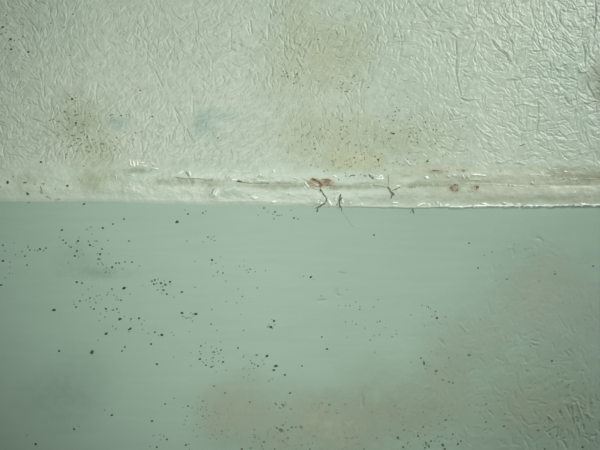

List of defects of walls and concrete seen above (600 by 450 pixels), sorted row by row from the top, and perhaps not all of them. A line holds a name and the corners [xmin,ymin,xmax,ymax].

crack [316,190,350,223]
crack [333,174,400,203]
leakage [393,153,600,203]
mould [73,281,163,336]